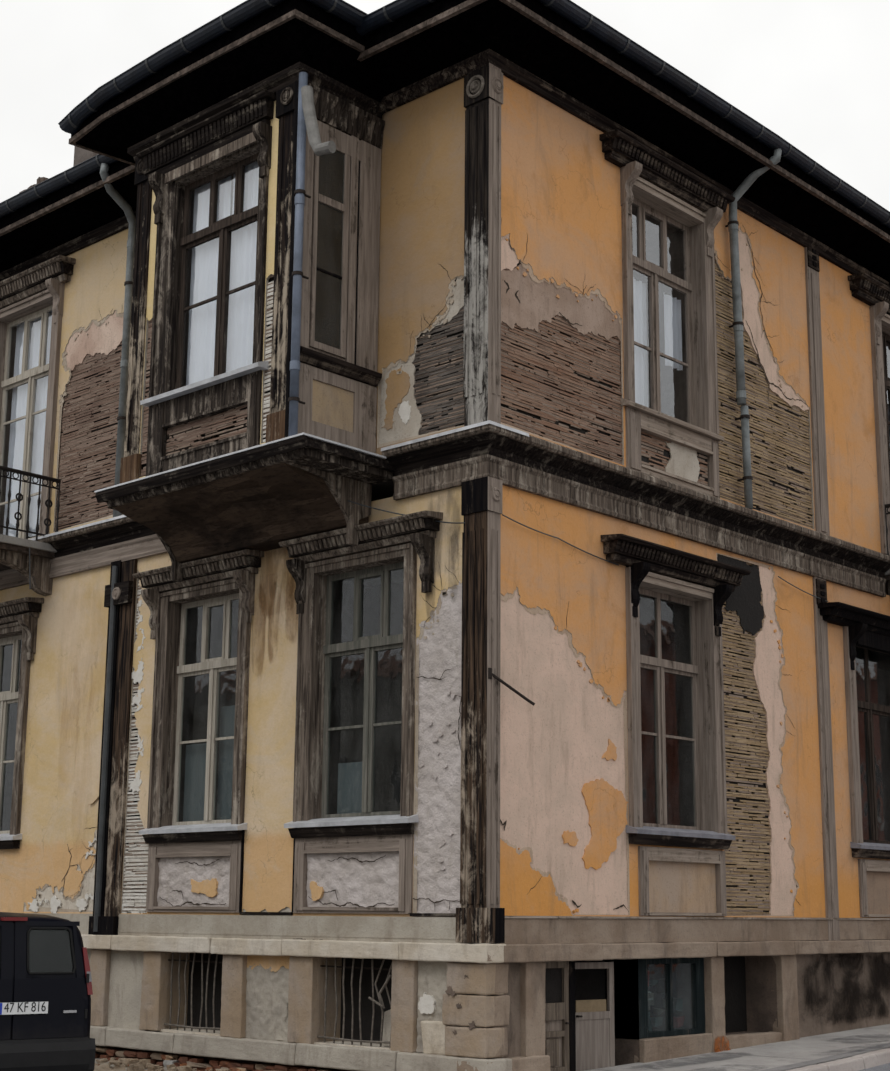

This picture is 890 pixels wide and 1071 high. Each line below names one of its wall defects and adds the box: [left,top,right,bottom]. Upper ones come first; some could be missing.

peeling [377,275,464,448]
spalling [54,310,124,532]
spalling [501,422,610,461]
peeling [130,770,142,795]
peeling [131,600,146,712]
flaking render [413,562,462,913]
flaking render [500,587,629,916]
spalling [716,553,789,816]
flaking render [24,827,97,913]
flaking render [157,856,230,907]
flaking render [306,851,399,907]
flaking render [245,955,290,1041]